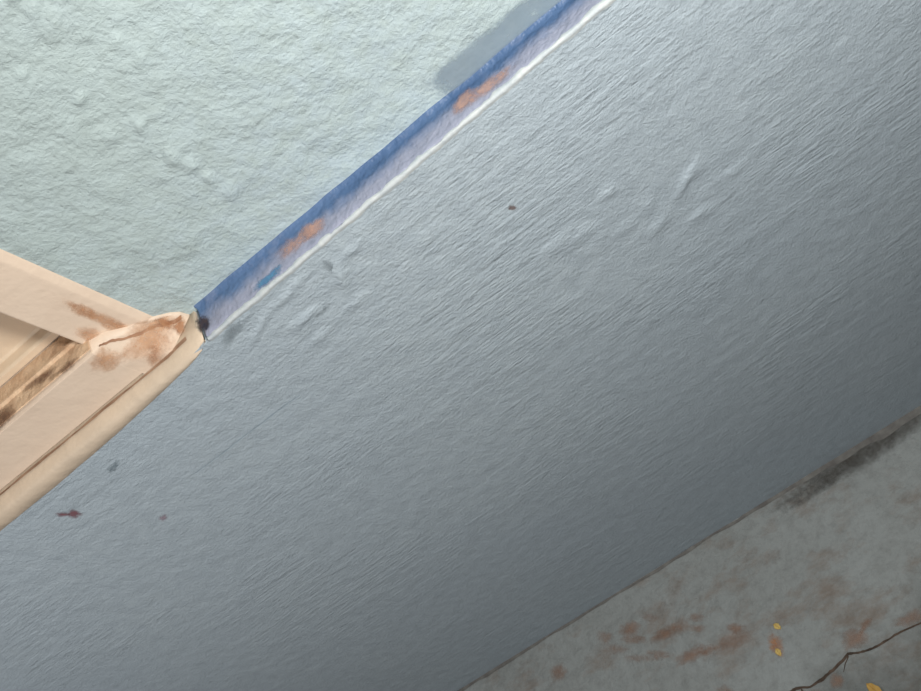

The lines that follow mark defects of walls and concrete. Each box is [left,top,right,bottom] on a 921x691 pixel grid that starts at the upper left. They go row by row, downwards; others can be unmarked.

corrosion [454,70,507,113]
corrosion [284,220,322,254]
crack [458,405,921,691]